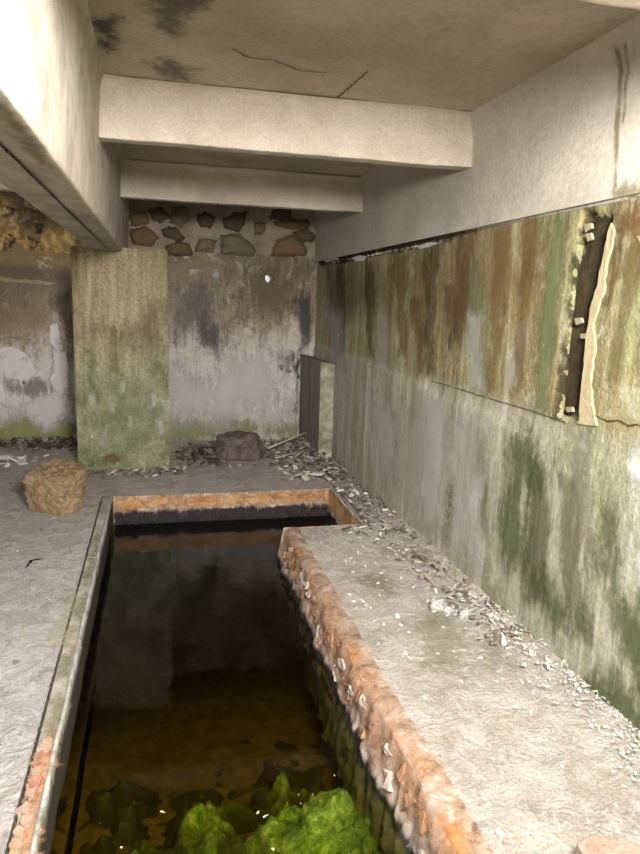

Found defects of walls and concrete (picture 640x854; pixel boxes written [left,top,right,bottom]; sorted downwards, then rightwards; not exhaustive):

mould [92,14,123,50]
mould [147,0,213,36]
water stain [615,47,628,156]
water stain [0,292,75,401]
water stain [174,284,222,353]
water stain [466,312,485,392]
water stain [506,325,527,388]
water stain [534,214,563,412]
spalling [553,210,616,426]
crack [433,381,566,423]
crack [595,414,640,426]
water stain [627,447,640,486]